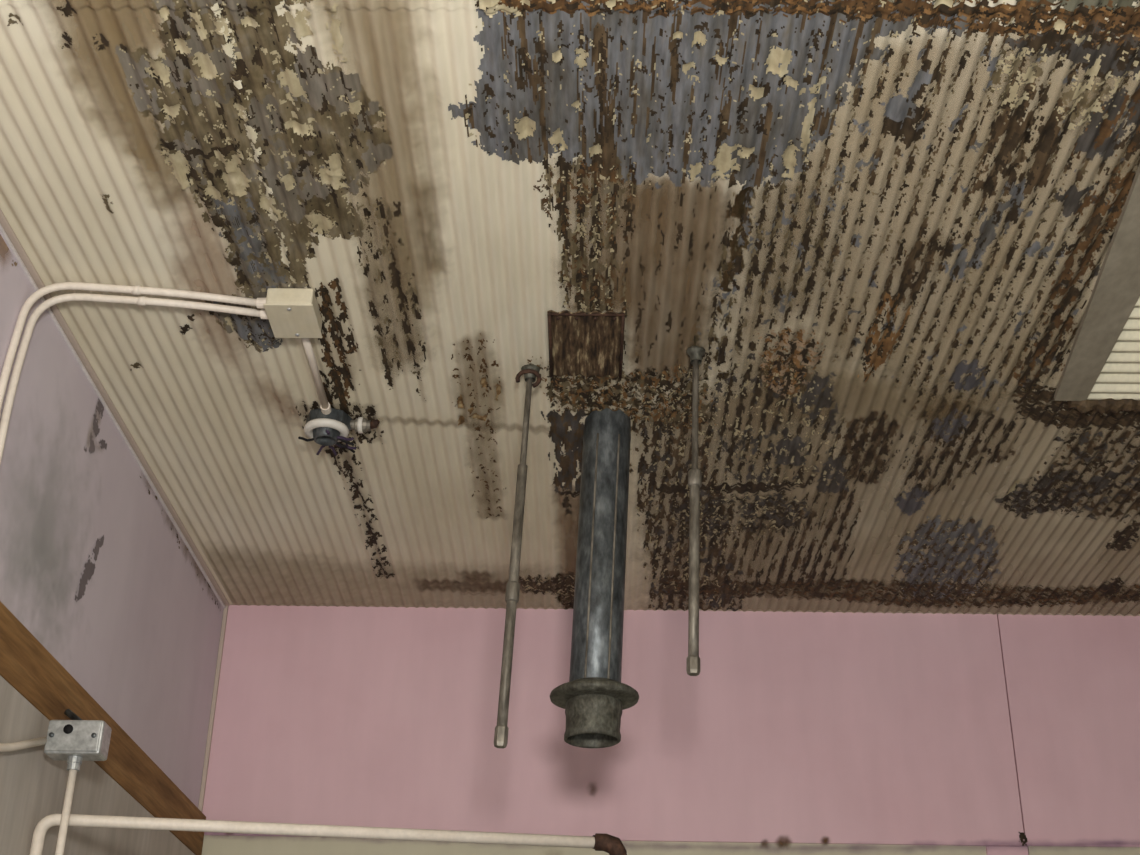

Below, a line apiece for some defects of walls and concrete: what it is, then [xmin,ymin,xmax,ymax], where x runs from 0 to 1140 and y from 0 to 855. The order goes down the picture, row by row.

peeling [56,0,78,17]
corrosion [475,0,1140,318]
peeling [93,0,426,579]
corrosion [451,333,506,518]
corrosion [528,356,716,432]
corrosion [757,326,825,397]
peeling [448,0,1140,611]
corrosion [857,286,911,382]
corrosion [1009,378,1140,432]
corrosion [1105,520,1140,552]
corrosion [657,576,1140,609]